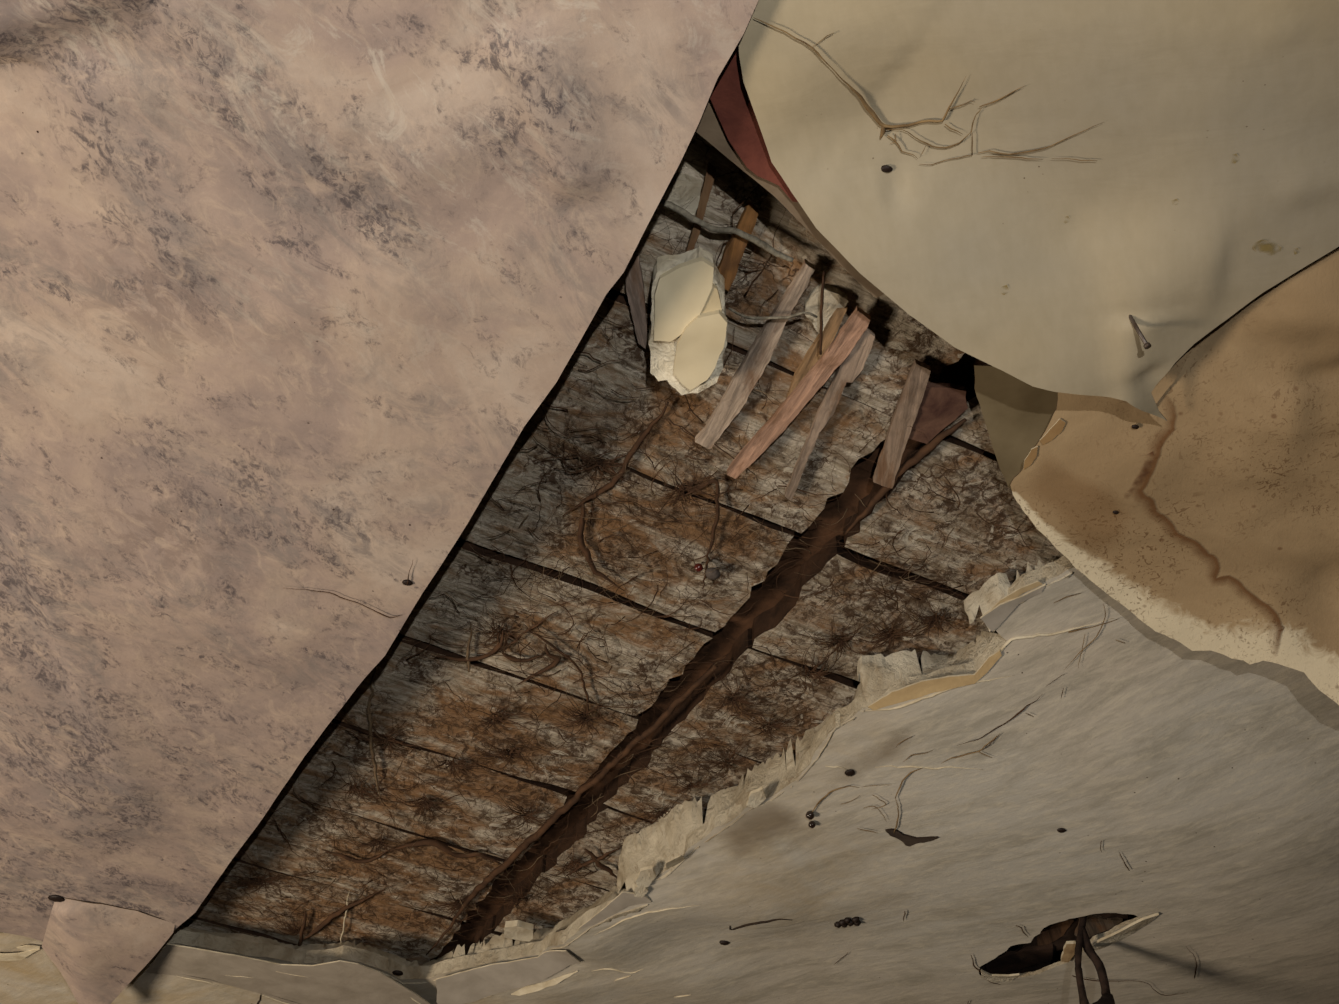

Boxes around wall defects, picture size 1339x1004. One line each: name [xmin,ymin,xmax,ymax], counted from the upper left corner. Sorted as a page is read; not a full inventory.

leakage [1138,415,1282,640]
peeling [144,559,1072,1004]
flaking render [979,913,1159,983]